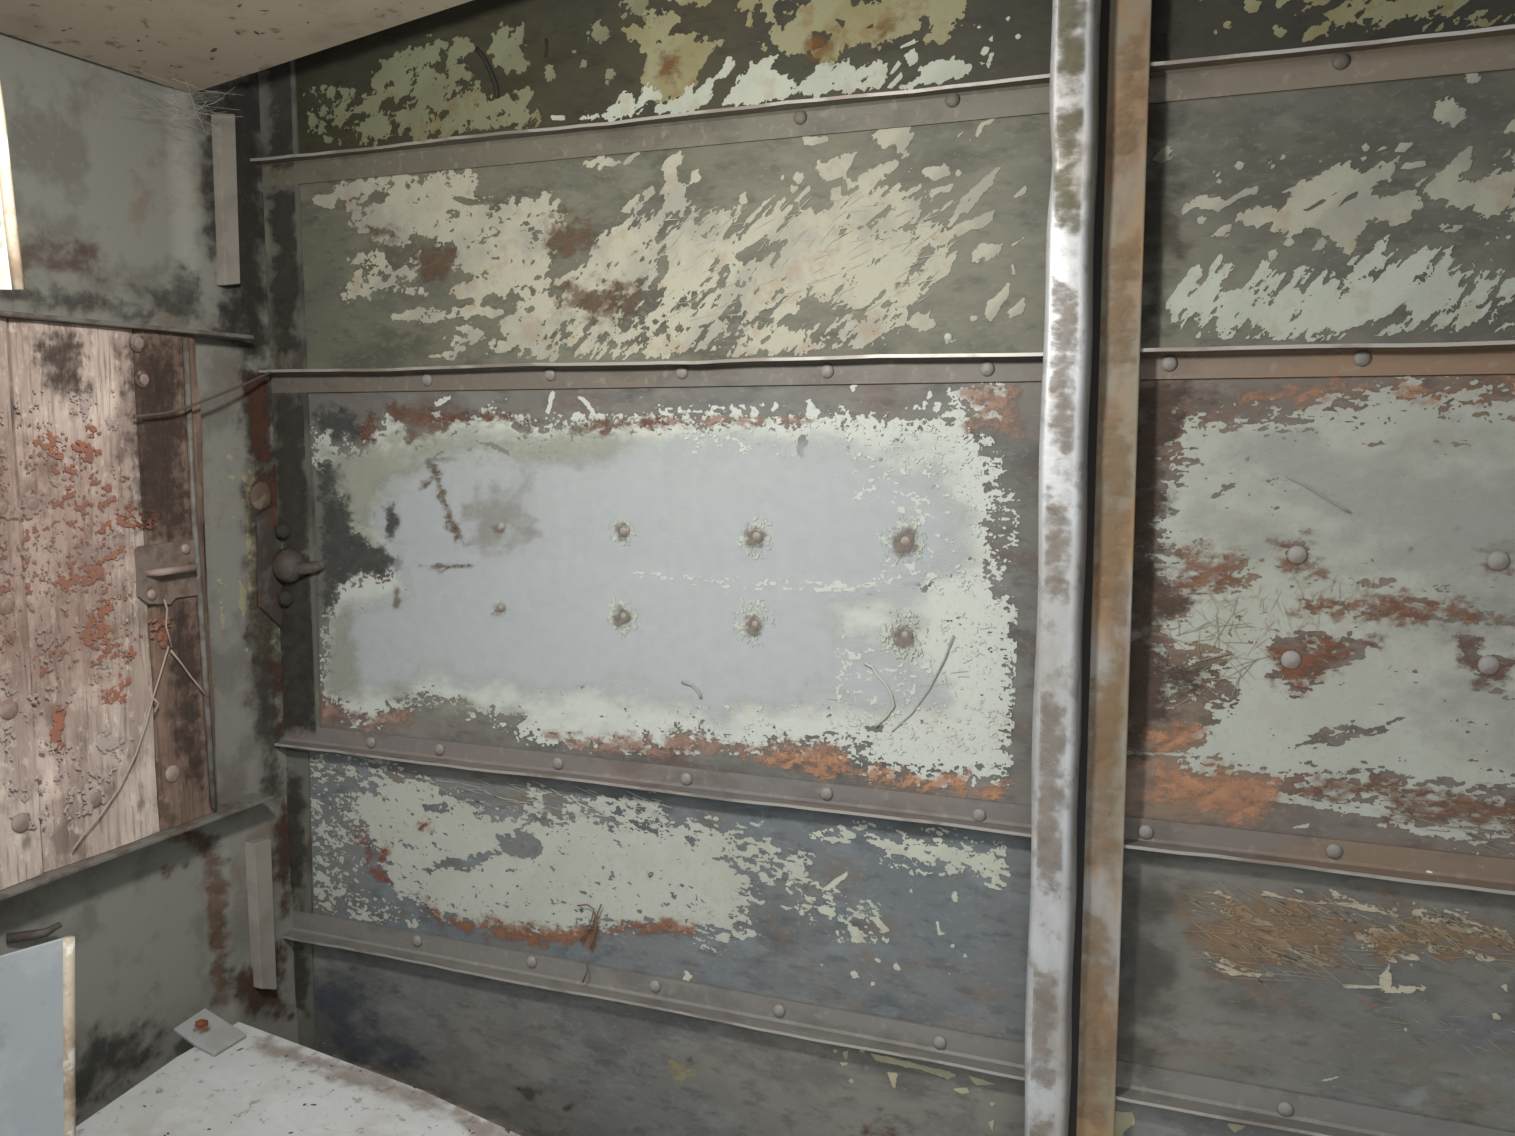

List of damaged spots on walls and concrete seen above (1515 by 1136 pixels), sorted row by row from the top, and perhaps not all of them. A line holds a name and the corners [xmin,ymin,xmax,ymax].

peeling [303,0,995,147]
peeling [312,126,1026,362]
peeling [1166,119,1515,342]
corrosion [359,403,535,445]
corrosion [564,415,813,436]
corrosion [1048,276,1077,453]
peeling [310,382,1020,790]
corrosion [1127,384,1282,824]
peeling [1127,375,1515,856]
corrosion [1290,588,1514,689]
peeling [309,753,1011,971]
corrosion [545,730,1012,800]